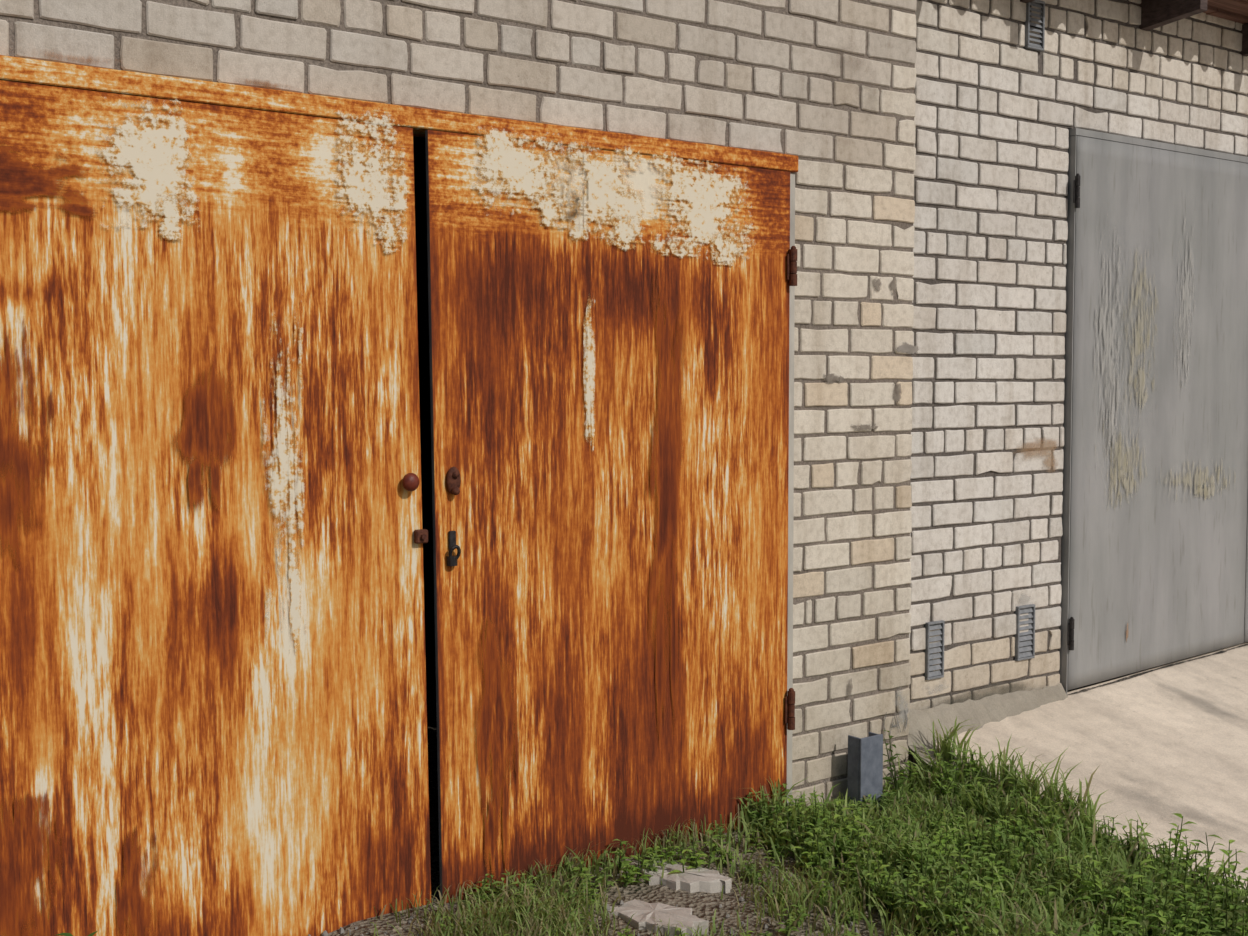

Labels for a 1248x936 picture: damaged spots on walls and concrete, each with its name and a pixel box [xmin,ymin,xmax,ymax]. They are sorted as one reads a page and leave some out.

corrosion [0,140,97,218]
peeling [98,100,201,240]
peeling [335,111,409,254]
peeling [473,127,758,266]
corrosion [0,320,54,568]
corrosion [174,361,236,511]
peeling [263,317,306,653]
corrosion [647,274,686,742]
corrosion [475,618,519,880]
corrosion [0,792,65,936]
corrosion [116,826,161,936]